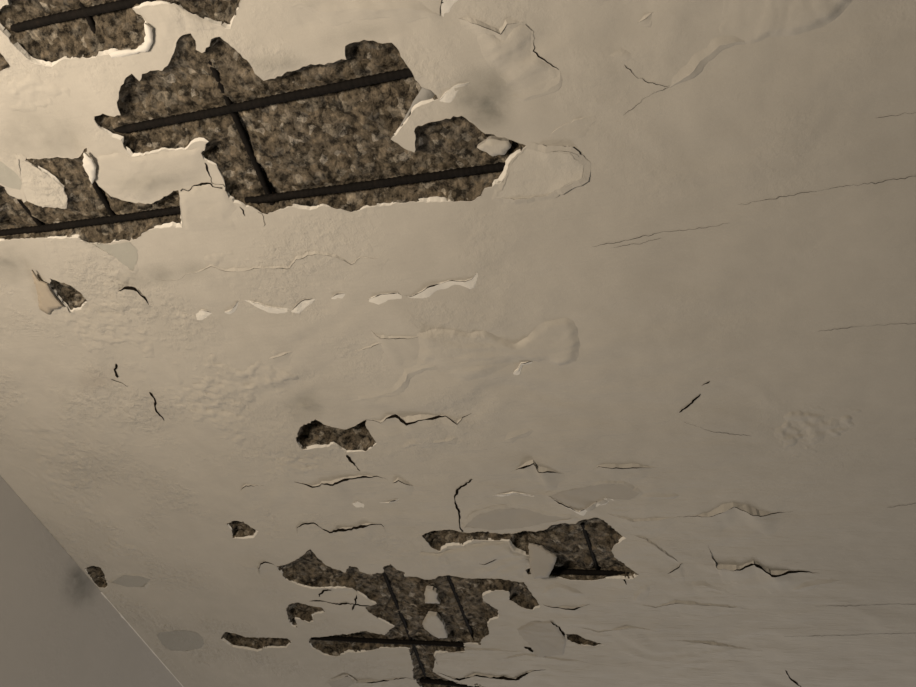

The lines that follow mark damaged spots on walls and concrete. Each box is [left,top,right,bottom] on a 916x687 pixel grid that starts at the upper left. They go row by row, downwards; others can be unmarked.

spalling [0,0,591,215]
spalling [0,148,182,274]
spalling [32,269,87,315]
peeling [118,286,151,315]
peeling [196,309,212,320]
peeling [225,298,315,314]
peeling [369,273,478,305]
peeling [296,414,475,452]
crack [454,479,472,532]
spalling [259,460,685,687]
peeling [708,547,822,594]
spalling [221,632,292,652]